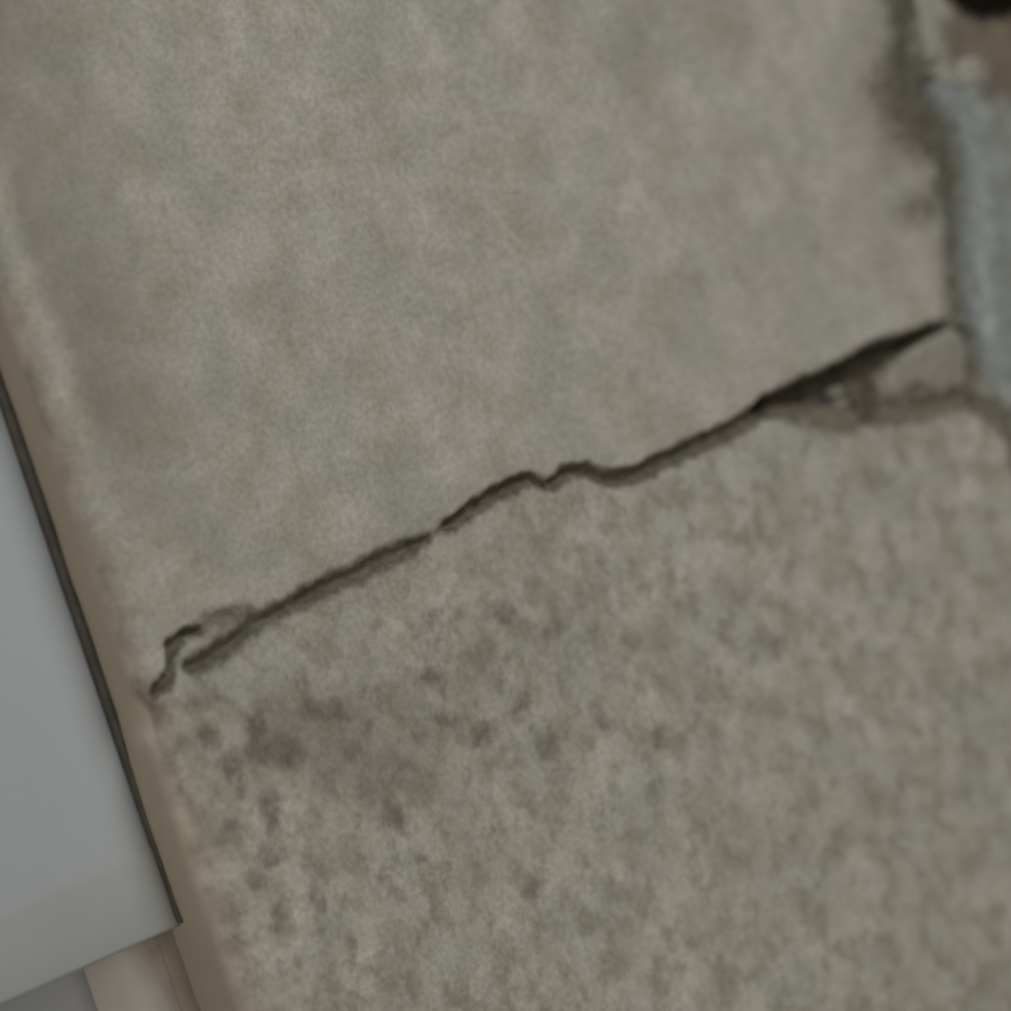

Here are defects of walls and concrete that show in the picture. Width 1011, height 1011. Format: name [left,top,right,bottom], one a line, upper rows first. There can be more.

crack [151,0,1011,700]